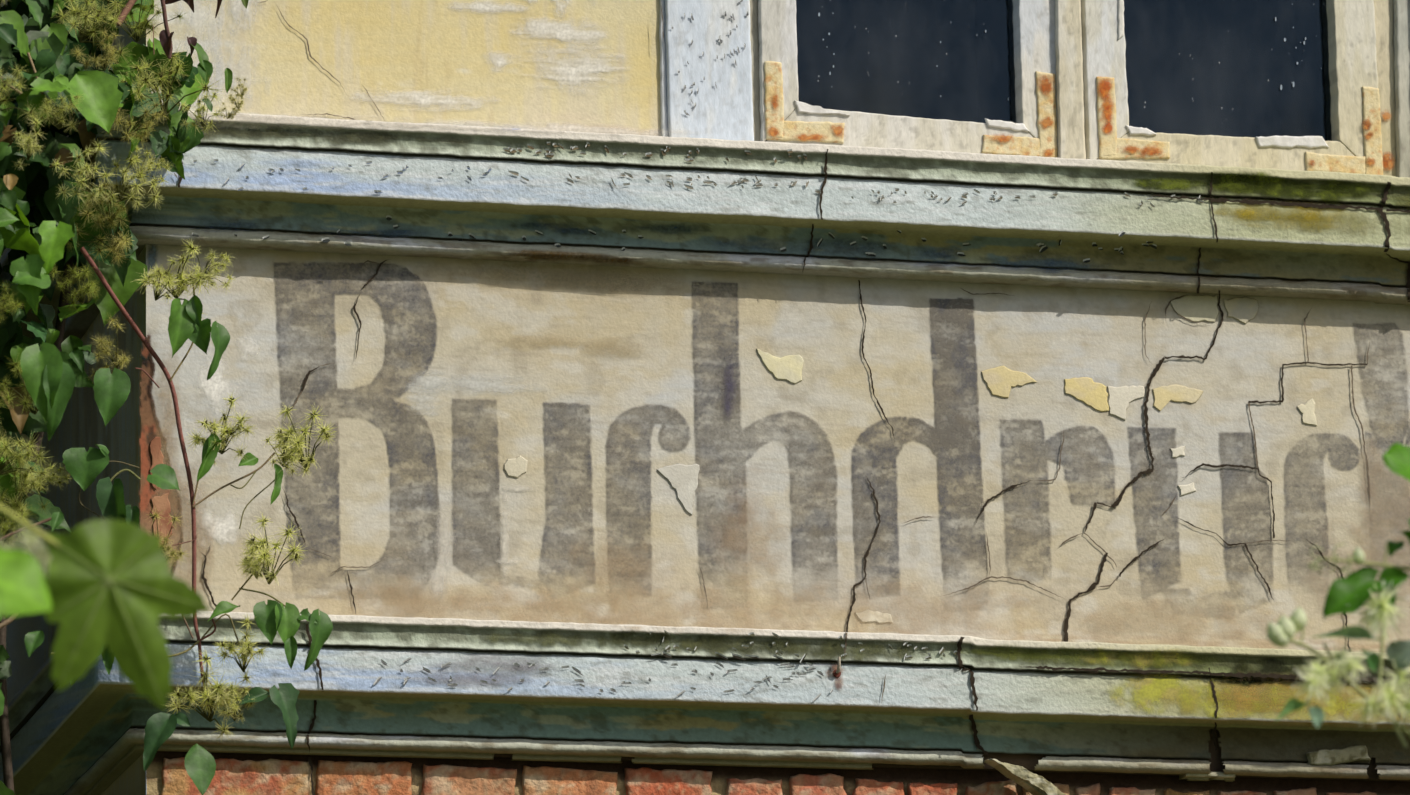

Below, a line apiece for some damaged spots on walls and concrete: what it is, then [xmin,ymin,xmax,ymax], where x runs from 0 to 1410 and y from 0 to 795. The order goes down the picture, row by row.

peeling [455,0,619,85]
peeling [191,56,821,193]
corrosion [798,126,843,141]
corrosion [1099,80,1112,133]
corrosion [1368,153,1394,170]
damp [1135,172,1380,230]
crack [858,280,895,442]
spalling [1064,377,1203,420]
spalling [657,463,700,515]
crack [944,172,1410,756]
crack [844,473,930,658]
damp [971,646,1410,724]